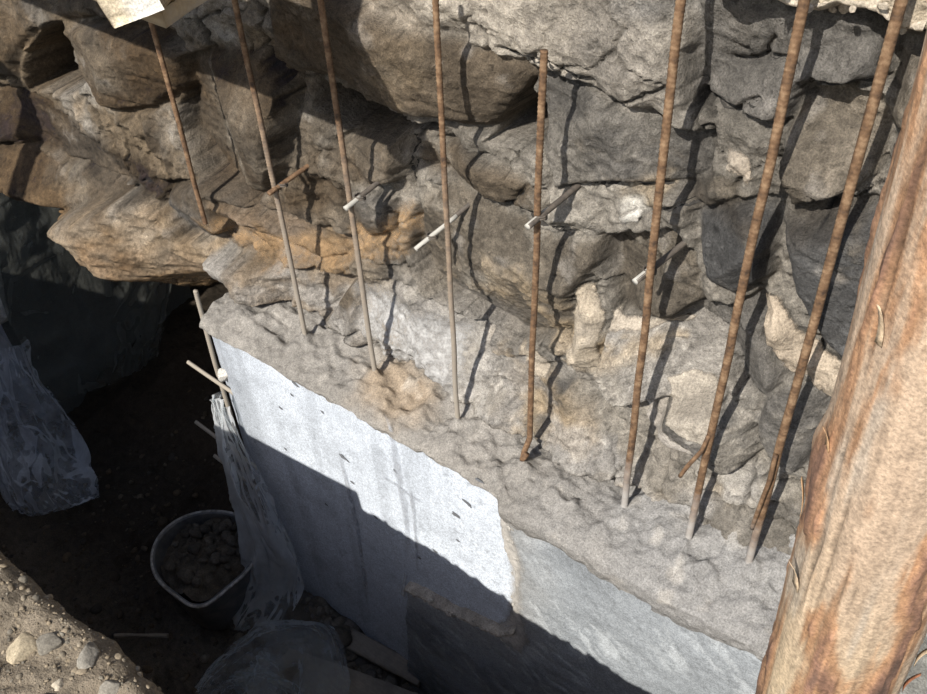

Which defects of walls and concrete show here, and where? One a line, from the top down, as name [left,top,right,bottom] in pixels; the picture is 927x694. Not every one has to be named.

spalling [403,518,527,650]